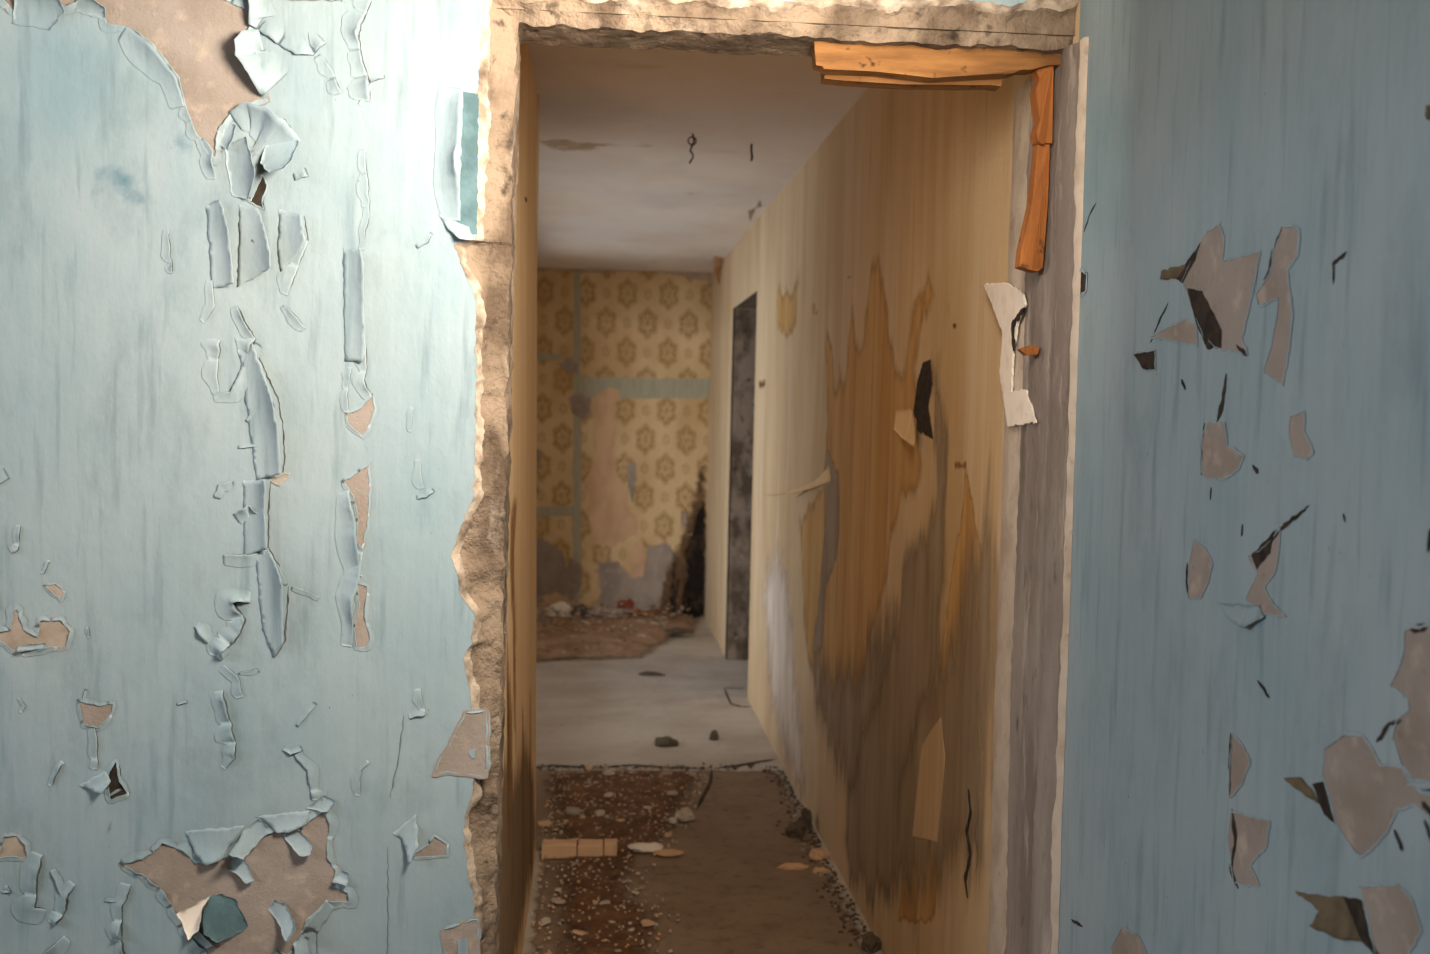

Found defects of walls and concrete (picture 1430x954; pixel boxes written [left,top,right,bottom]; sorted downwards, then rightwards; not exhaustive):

peeling [0,0,309,211]
peeling [340,149,378,439]
peeling [1133,224,1301,386]
peeling [274,461,376,658]
leakage [660,467,706,618]
flaking render [393,0,1096,954]
peeling [1185,505,1309,628]
peeling [118,796,358,954]
leakage [499,504,535,954]
peeling [1227,734,1271,888]
peeling [1284,623,1430,858]
peeling [1295,882,1423,954]